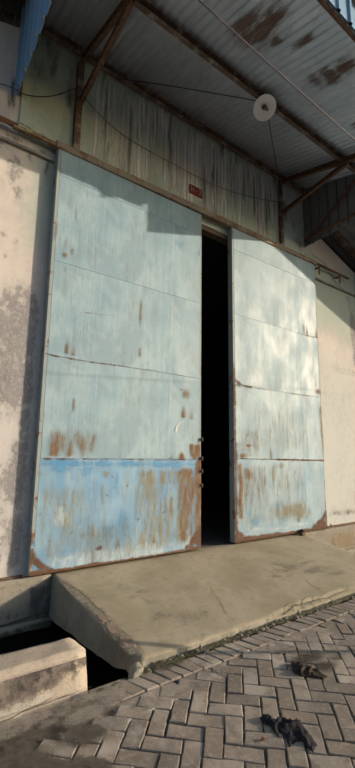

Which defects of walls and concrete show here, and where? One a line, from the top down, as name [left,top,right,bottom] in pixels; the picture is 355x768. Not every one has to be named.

rust [231,7,288,47]
rust [309,58,355,86]
rust [234,369,327,543]
rust [29,432,201,576]
crack [283,581,345,615]